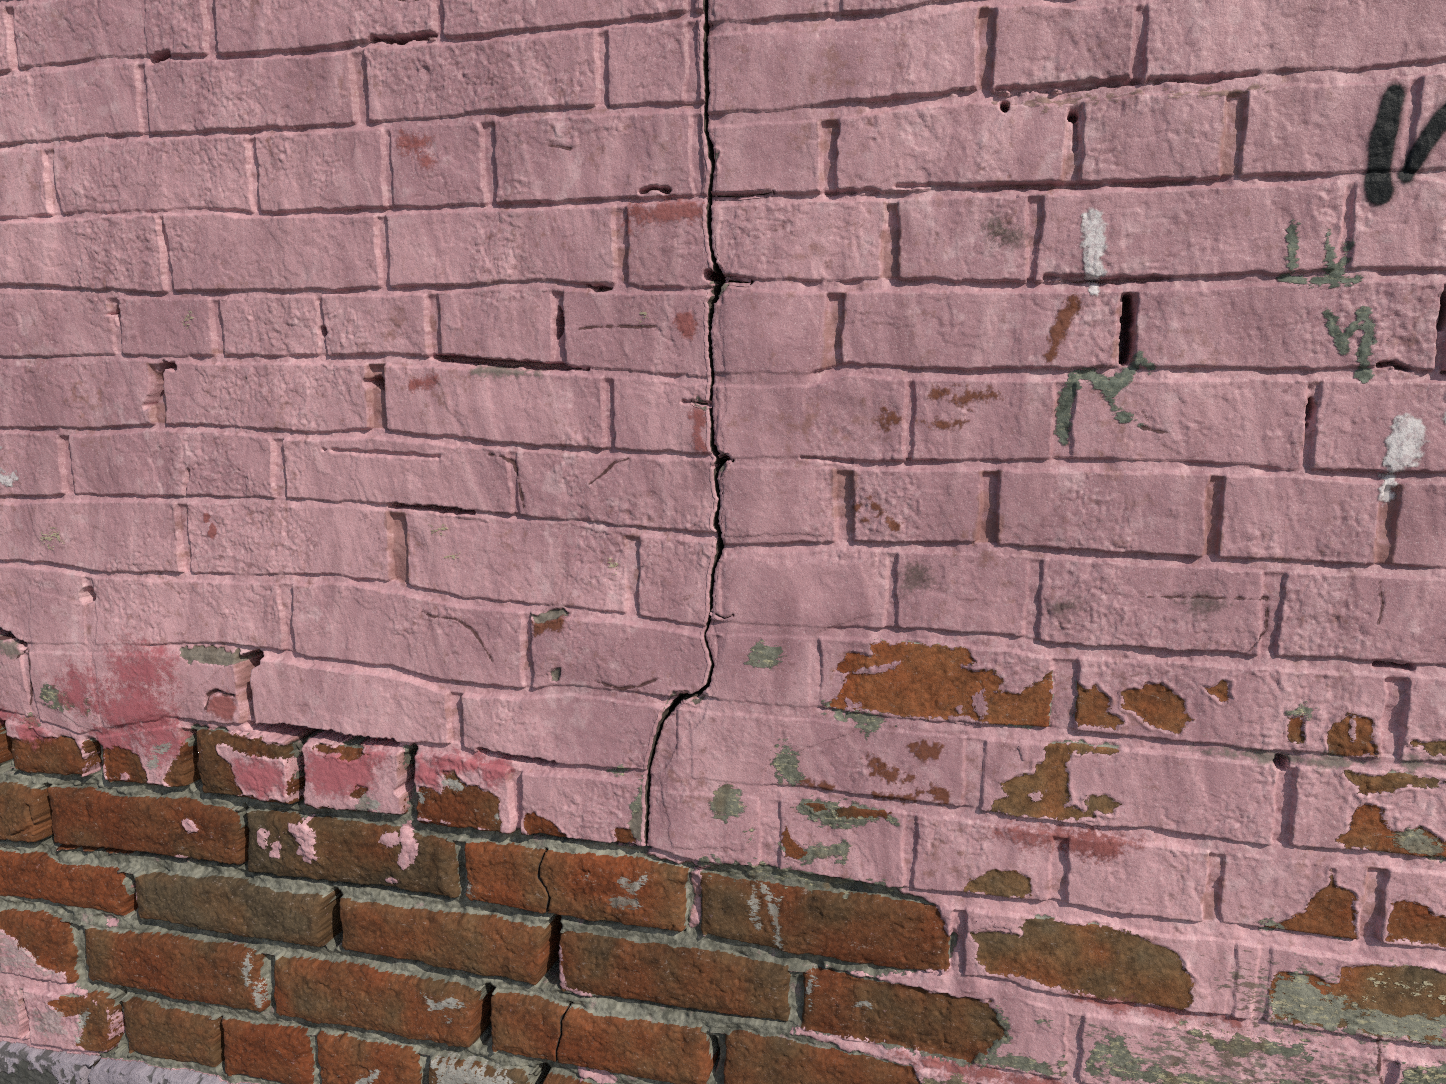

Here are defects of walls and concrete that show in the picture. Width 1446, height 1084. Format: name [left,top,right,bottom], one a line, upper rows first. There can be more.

crack [597,0,774,846]
spalling [179,645,262,667]
crack [422,611,493,662]
spalling [530,608,569,624]
peeling [744,637,787,670]
peeling [821,638,1195,823]
peeling [0,680,1446,1084]